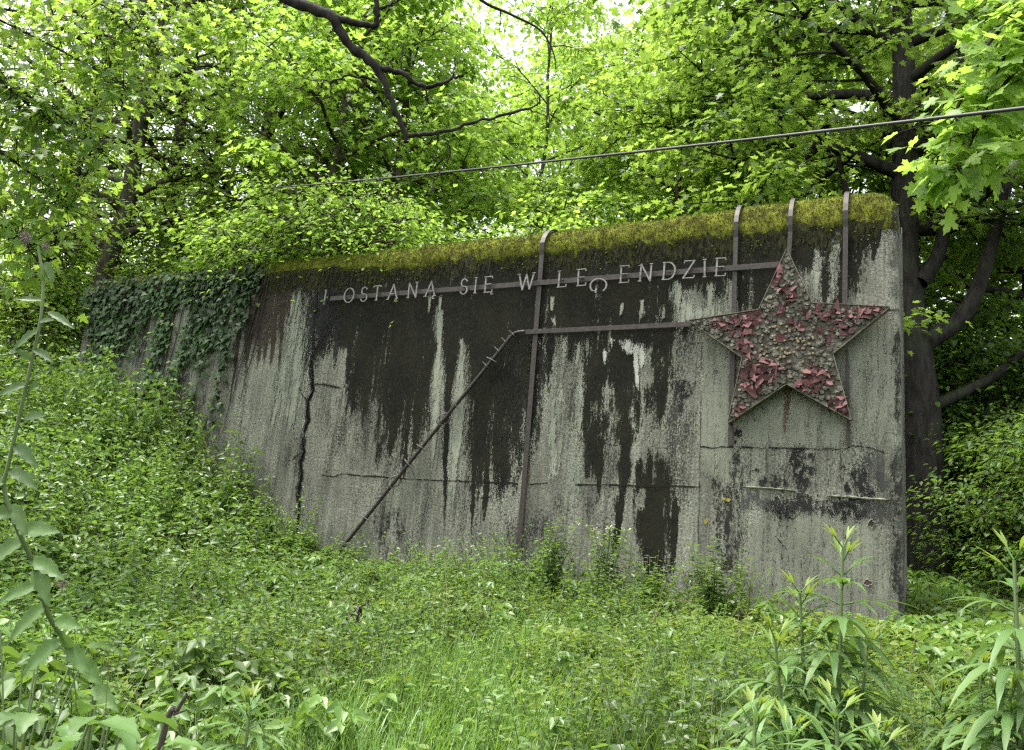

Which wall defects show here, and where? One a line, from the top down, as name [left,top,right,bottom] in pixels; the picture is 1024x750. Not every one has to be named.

leakage [229,268,346,438]
crack [292,271,548,543]
leakage [387,294,647,556]
leakage [656,375,696,427]
leakage [659,276,748,329]
leakage [808,230,842,304]
leakage [871,229,882,261]
leakage [643,496,680,598]
leakage [709,450,745,577]